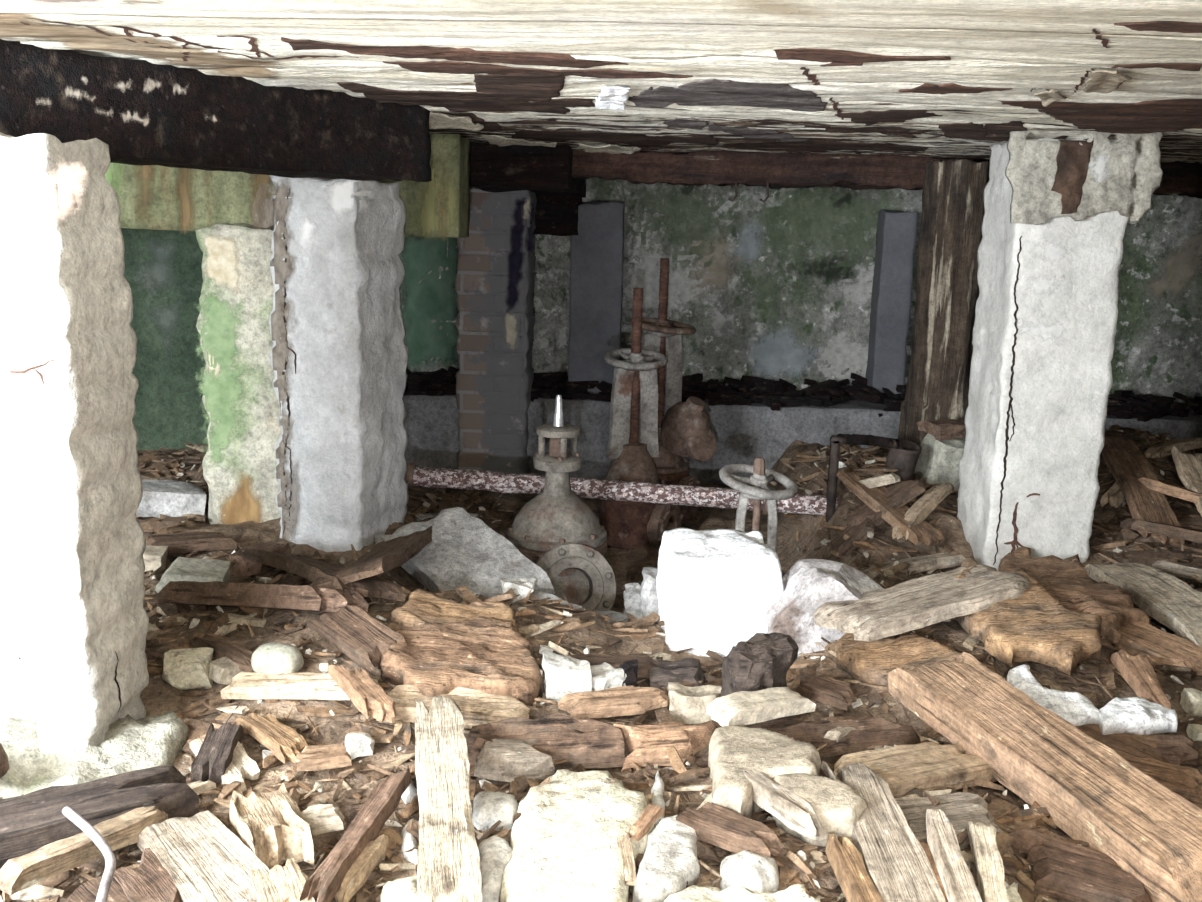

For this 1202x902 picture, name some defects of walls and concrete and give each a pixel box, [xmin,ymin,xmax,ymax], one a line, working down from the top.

peeling [898,83,1012,94]
peeling [382,61,693,147]
peeling [707,110,942,152]
peeling [578,143,641,154]
peeling [1089,155,1108,182]
water stain [814,259,852,280]
crack [0,359,55,385]
crack [993,236,1040,565]
corrosion [221,477,262,524]